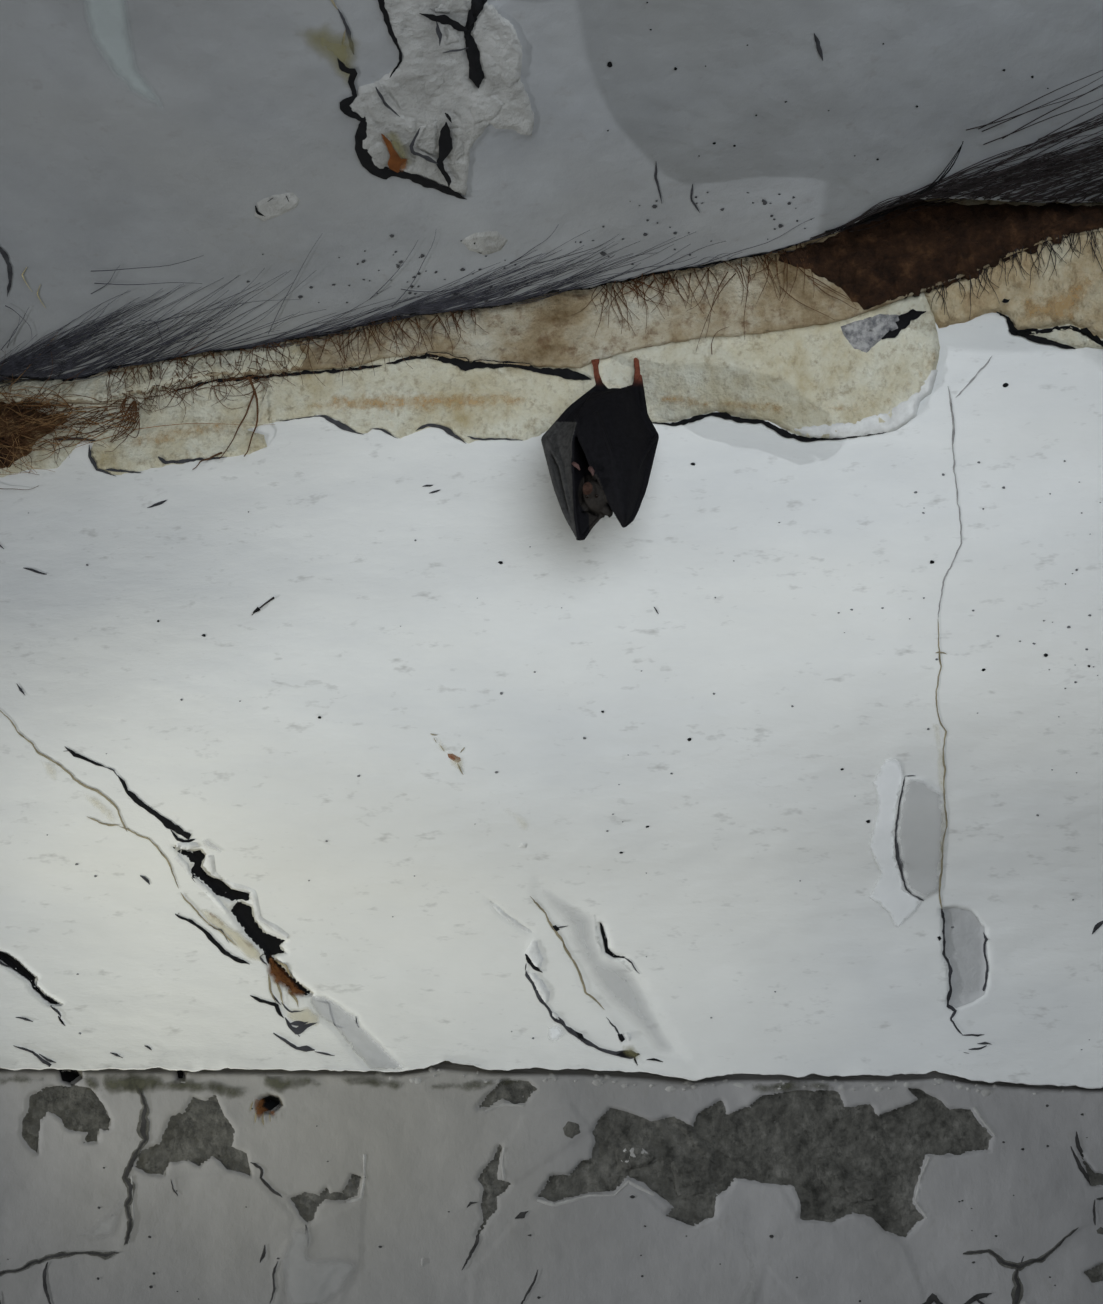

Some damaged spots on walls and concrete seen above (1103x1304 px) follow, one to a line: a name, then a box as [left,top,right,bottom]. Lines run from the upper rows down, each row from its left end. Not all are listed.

rust [381,134,407,173]
crack [330,0,487,199]
flaking render [349,0,534,196]
spalling [841,309,926,353]
crack [895,312,1103,1034]
crack [0,710,359,1056]
rust [181,893,304,1005]
crack [525,896,663,1065]
flaking render [22,1084,110,1152]
flaking render [135,1095,250,1176]
flaking render [515,1088,996,1237]
crack [923,1227,1079,1304]